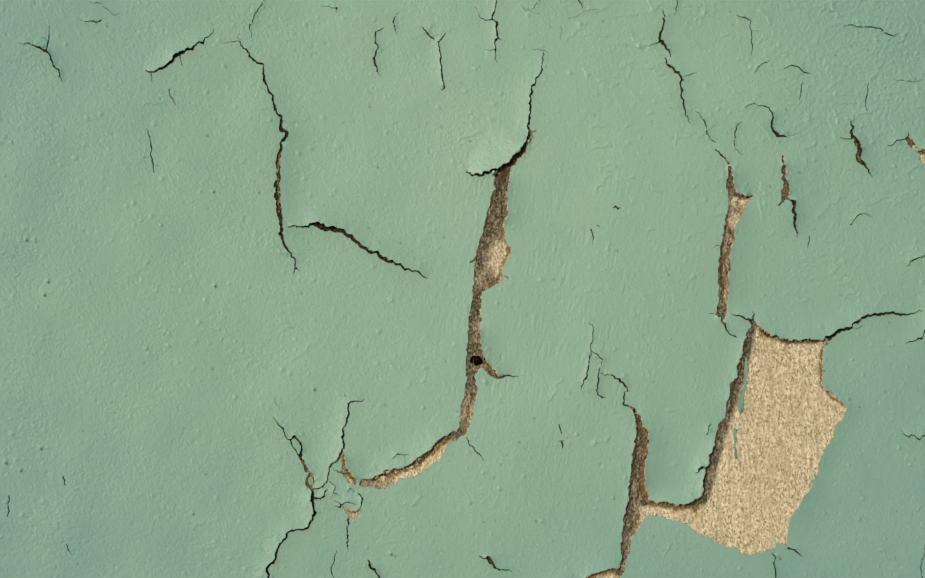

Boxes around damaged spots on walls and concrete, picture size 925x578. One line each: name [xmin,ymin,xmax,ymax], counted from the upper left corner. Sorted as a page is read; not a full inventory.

crack [145,2,436,279]
crack [421,24,446,90]
crack [648,0,698,124]
crack [249,386,363,578]
peeling [305,49,547,550]
peeling [540,111,925,578]
crack [901,422,925,440]
crack [905,290,925,344]